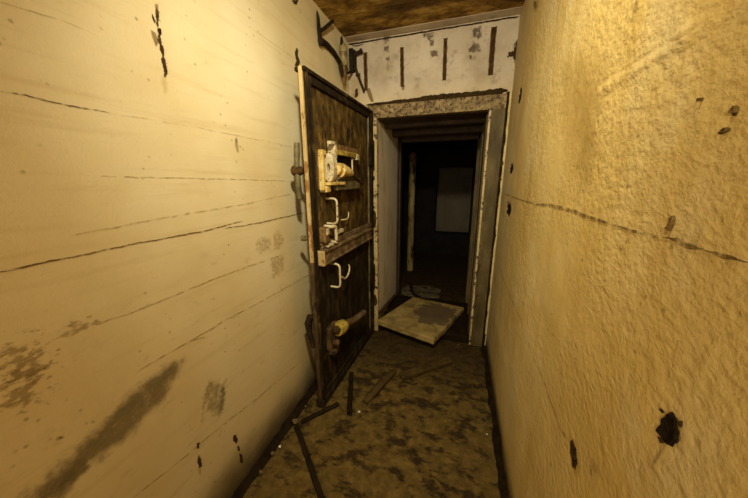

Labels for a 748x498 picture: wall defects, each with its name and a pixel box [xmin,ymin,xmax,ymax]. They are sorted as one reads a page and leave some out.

crack [2,91,106,112]
crack [0,212,304,272]
crack [505,194,748,263]
leakage [36,363,177,498]
hole [655,409,683,447]